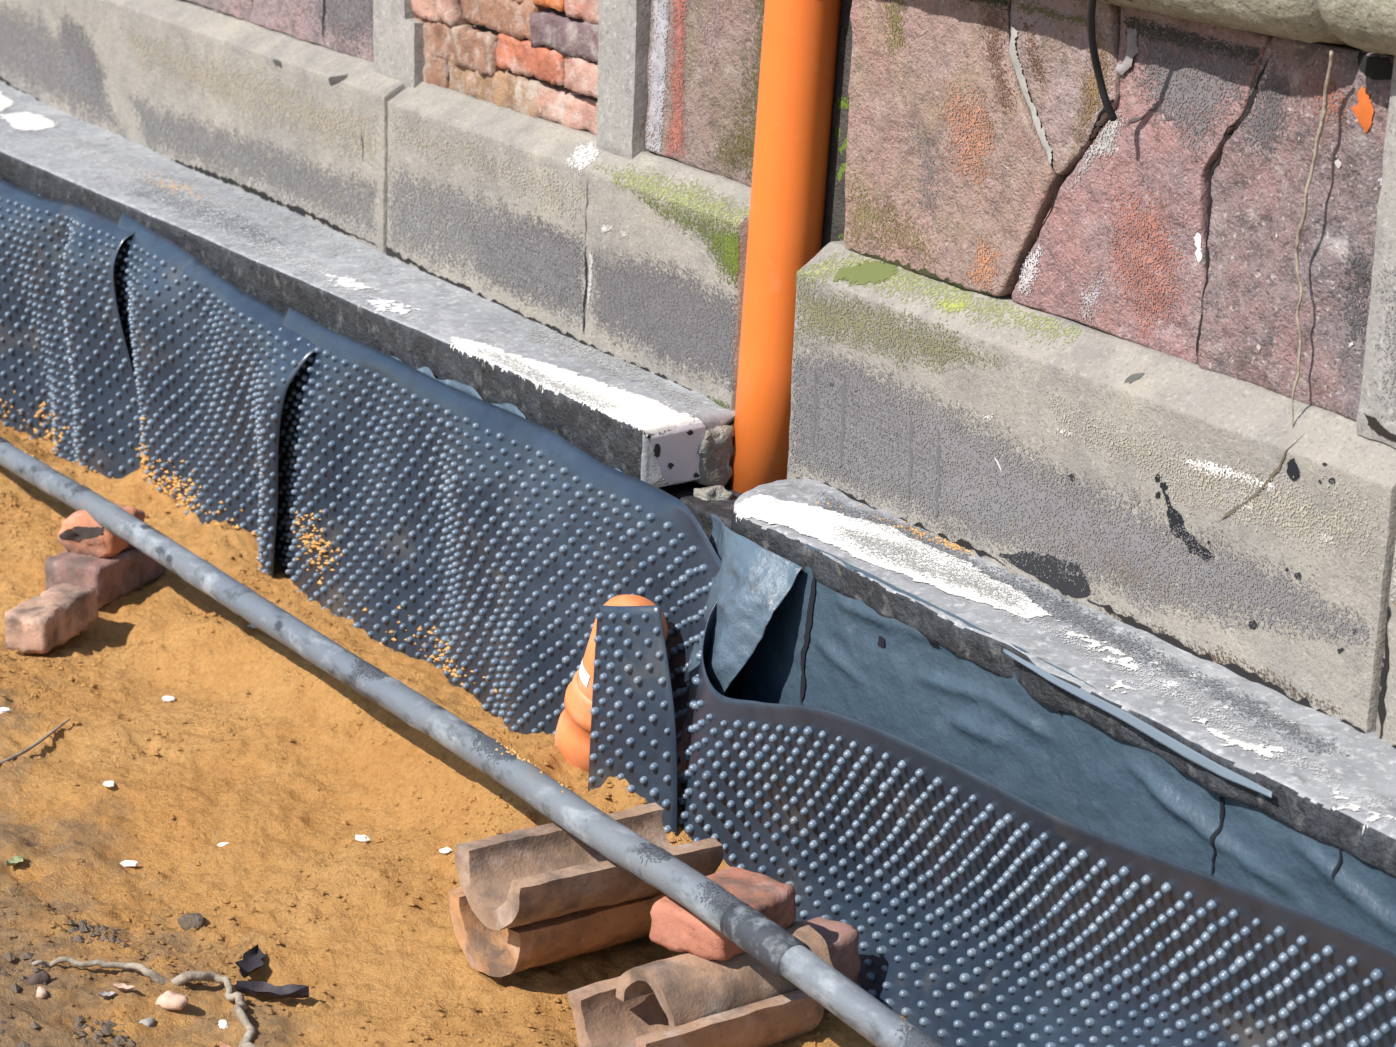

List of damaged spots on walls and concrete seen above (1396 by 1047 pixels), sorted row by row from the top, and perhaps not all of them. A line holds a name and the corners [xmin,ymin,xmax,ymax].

crack [320,0,328,43]
damp [0,0,737,411]
crack [1012,96,1175,292]
crack [1196,52,1273,364]
damp [777,533,829,566]
damp [787,280,1396,811]
crack [1087,599,1396,749]